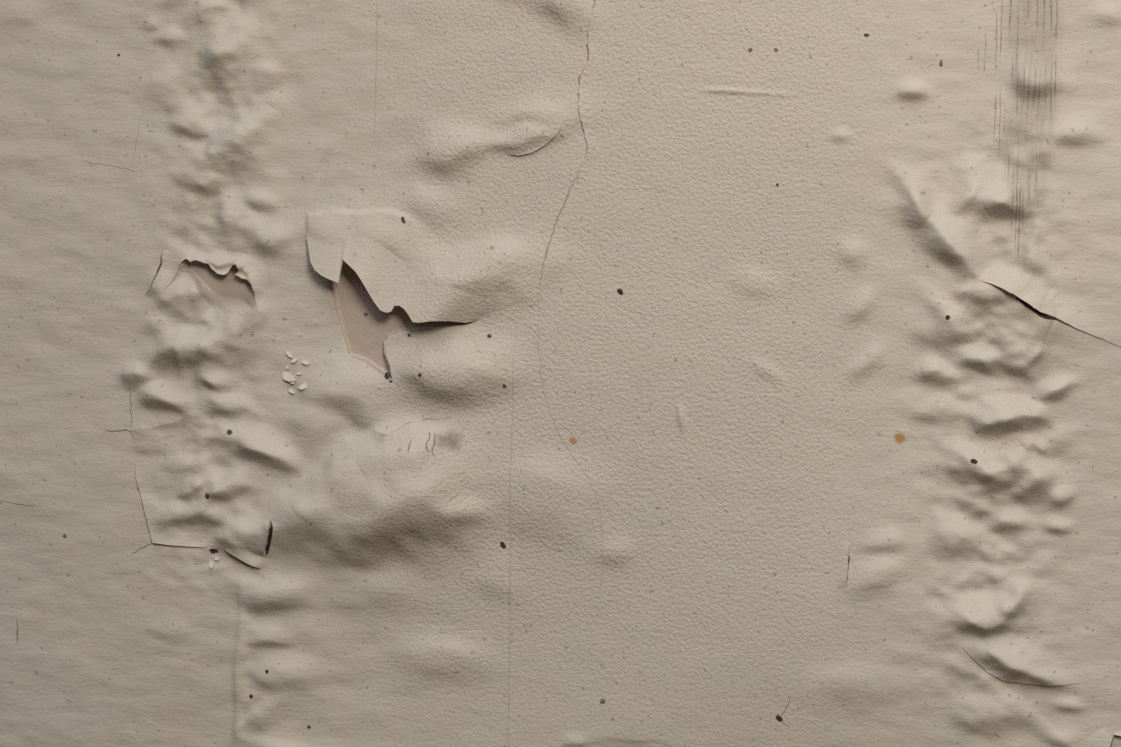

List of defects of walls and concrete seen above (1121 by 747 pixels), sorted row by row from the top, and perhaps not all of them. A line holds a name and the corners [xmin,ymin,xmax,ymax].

peeling [145,244,271,307]
peeling [305,212,498,397]
crack [980,266,1121,347]
crack [105,384,287,570]